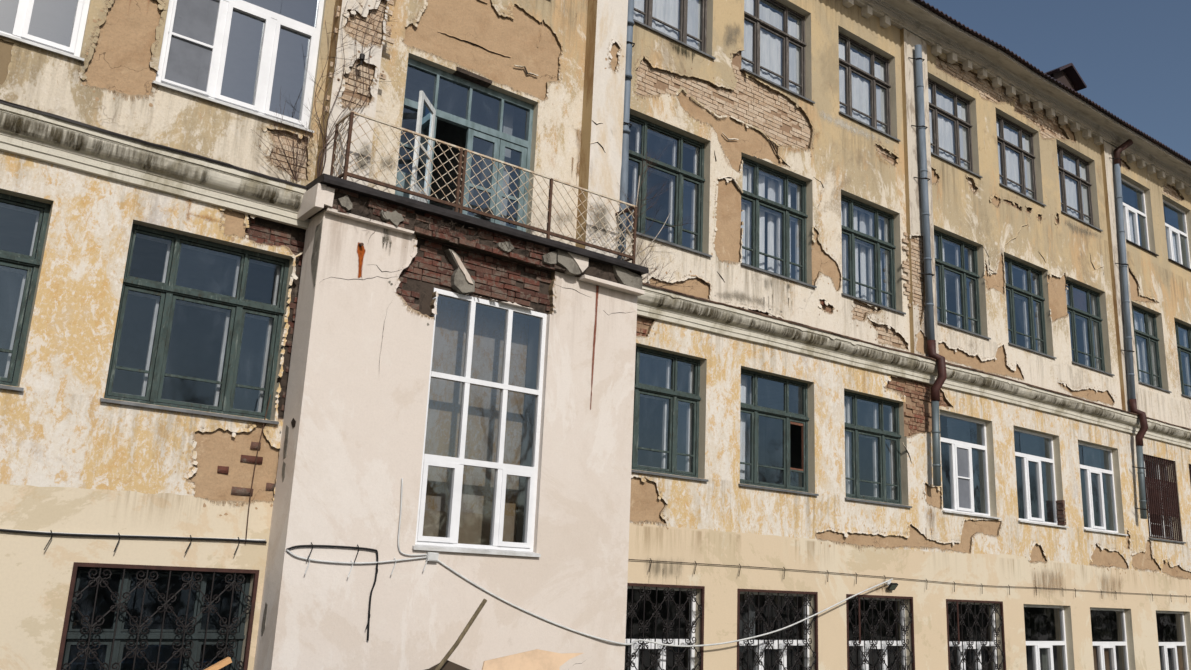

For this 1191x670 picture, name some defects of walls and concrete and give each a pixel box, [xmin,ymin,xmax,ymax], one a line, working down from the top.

flaking render [78,0,167,107]
flaking render [324,0,566,115]
leakage [0,113,85,151]
spalling [605,39,814,267]
leakage [254,188,276,204]
rust [357,242,365,278]
flaking render [812,226,1025,380]
spalling [175,185,557,516]
spalling [881,375,954,443]
spalling [630,474,669,530]
flaking render [815,518,1002,554]
flaking render [1089,529,1191,580]